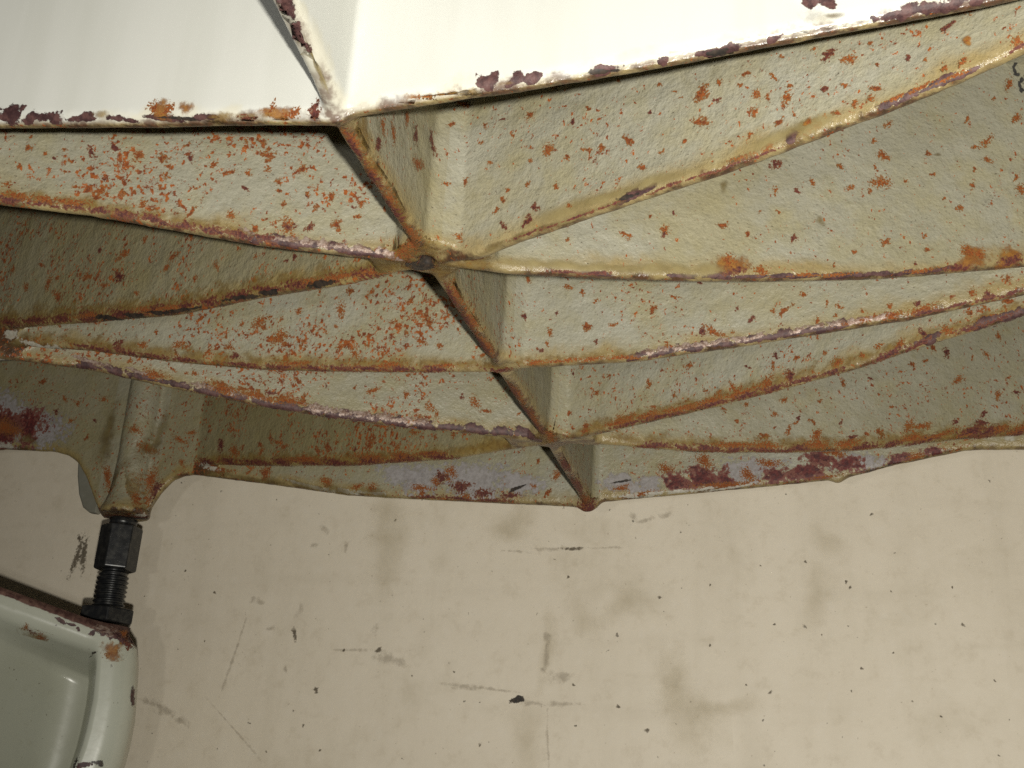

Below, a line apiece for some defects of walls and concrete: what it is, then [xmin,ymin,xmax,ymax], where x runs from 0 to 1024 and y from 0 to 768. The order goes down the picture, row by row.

peeling [695,42,742,58]
peeling [870,0,984,23]
peeling [0,98,220,127]
corrosion [637,71,841,195]
corrosion [0,92,470,403]
corrosion [501,241,986,318]
corrosion [816,246,1024,380]
corrosion [0,388,80,450]
corrosion [178,430,463,497]
corrosion [403,477,513,503]
corrosion [579,350,847,435]
corrosion [615,410,1024,499]